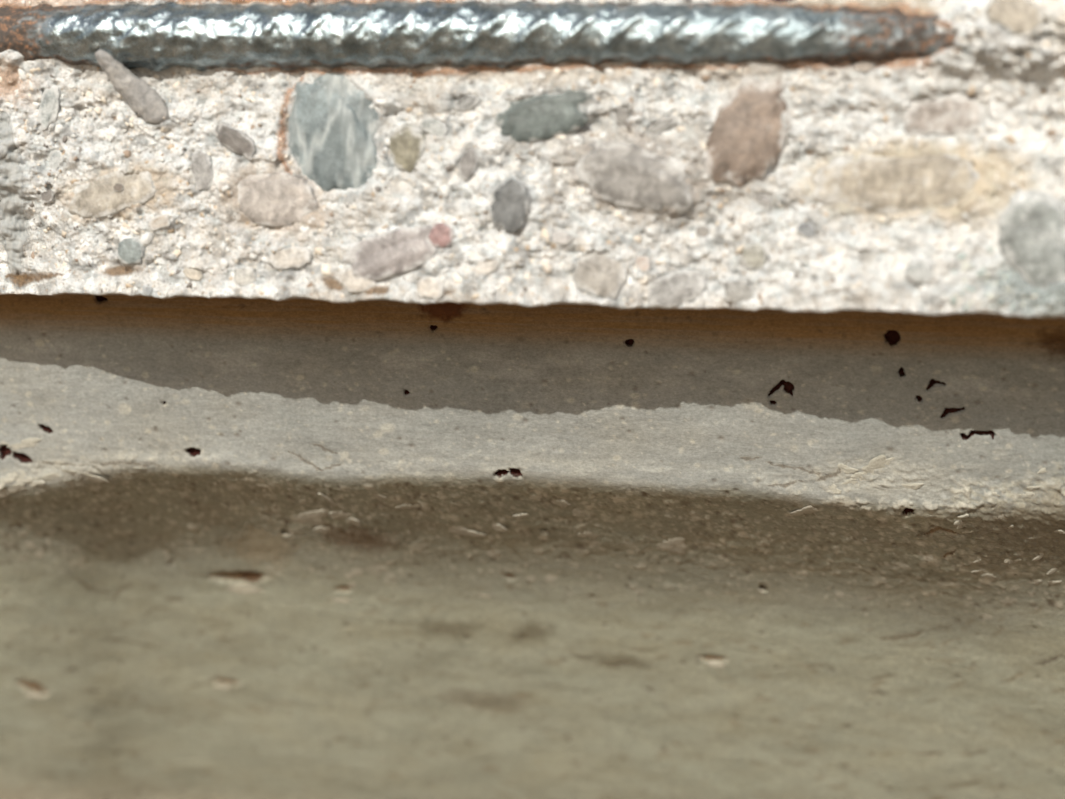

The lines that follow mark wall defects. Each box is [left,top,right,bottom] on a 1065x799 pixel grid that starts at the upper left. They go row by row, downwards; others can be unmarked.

spalling [0,0,1065,318]